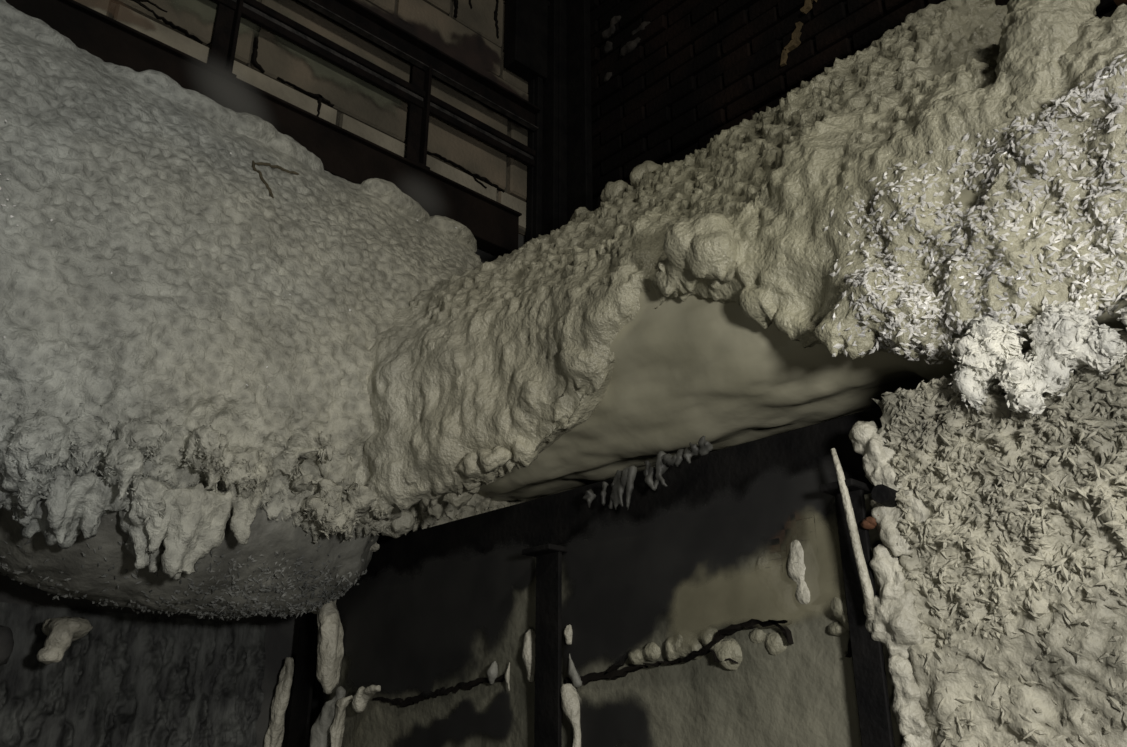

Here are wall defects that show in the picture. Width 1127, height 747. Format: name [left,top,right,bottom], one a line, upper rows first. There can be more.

crack [453,0,506,39]
crack [780,0,817,67]
crack [566,619,794,685]
crack [372,674,505,707]